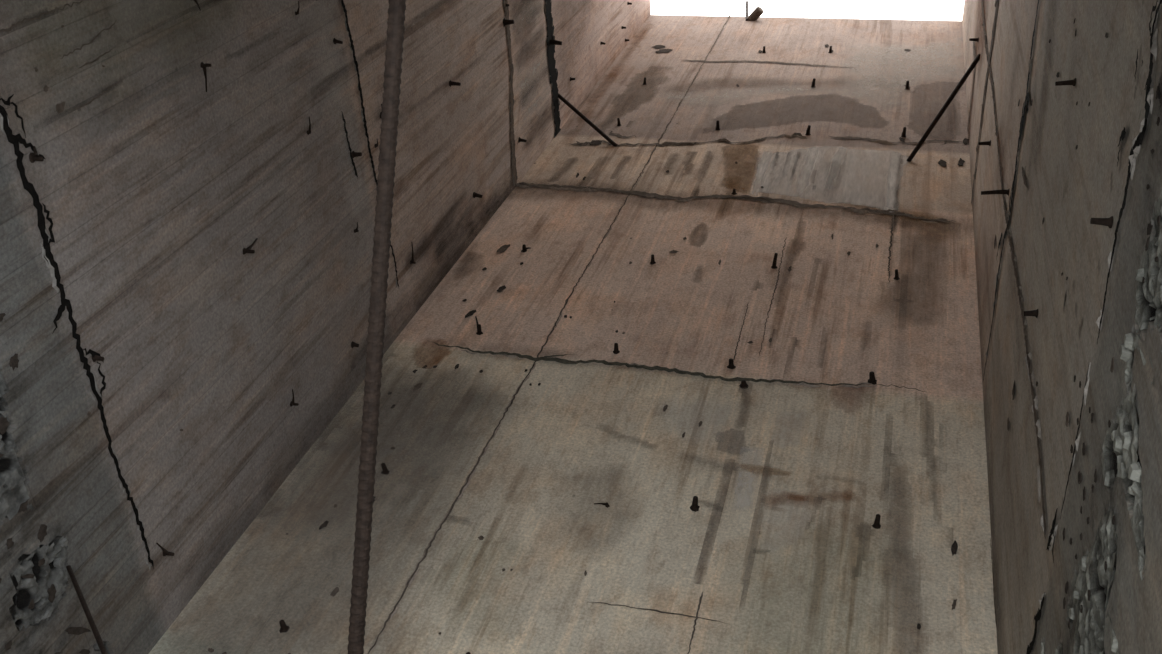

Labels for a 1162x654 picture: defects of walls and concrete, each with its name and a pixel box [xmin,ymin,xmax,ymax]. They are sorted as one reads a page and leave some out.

crack [0,0,83,32]
crack [61,21,116,69]
crack [341,0,378,185]
spalling [0,354,34,520]
crack [0,94,154,570]
crack [368,0,1162,654]
spalling [1062,184,1162,654]